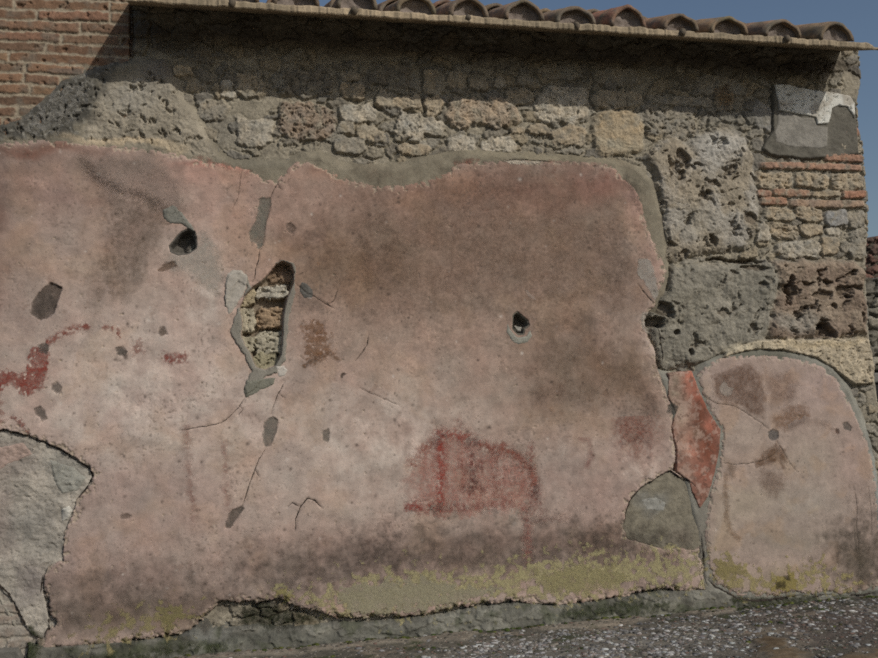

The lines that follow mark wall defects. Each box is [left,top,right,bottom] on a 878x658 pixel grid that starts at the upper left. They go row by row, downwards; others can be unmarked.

peeling [774,84,855,124]
spalling [32,284,62,319]
crack [702,394,795,469]
spalling [0,430,94,639]
crack [291,498,320,529]
spalling [623,472,701,550]